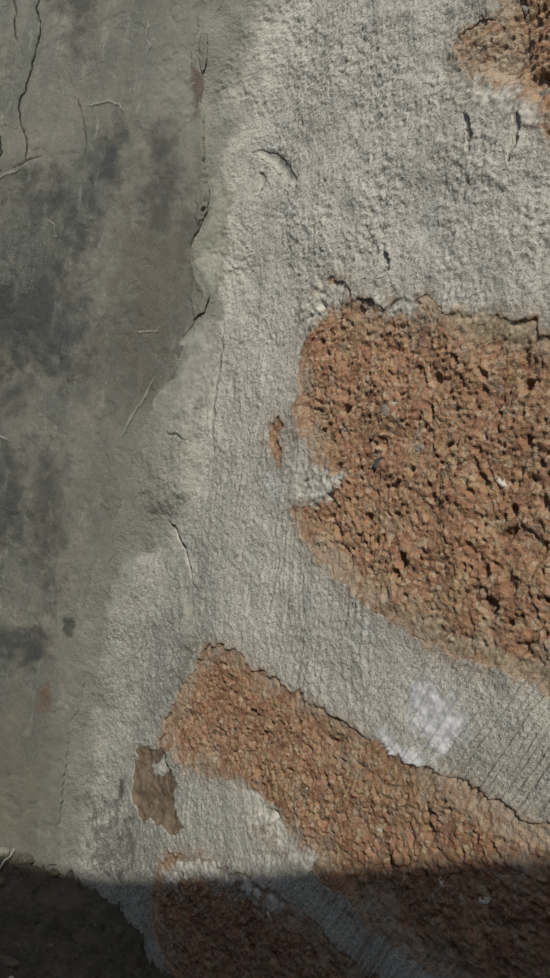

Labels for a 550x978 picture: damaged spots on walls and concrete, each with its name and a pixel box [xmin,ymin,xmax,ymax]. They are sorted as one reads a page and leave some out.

crack [0,0,42,172]
spalling [508,113,520,161]
leakage [0,195,79,364]
spalling [270,417,284,466]
leakage [376,680,471,767]
spalling [132,744,184,835]